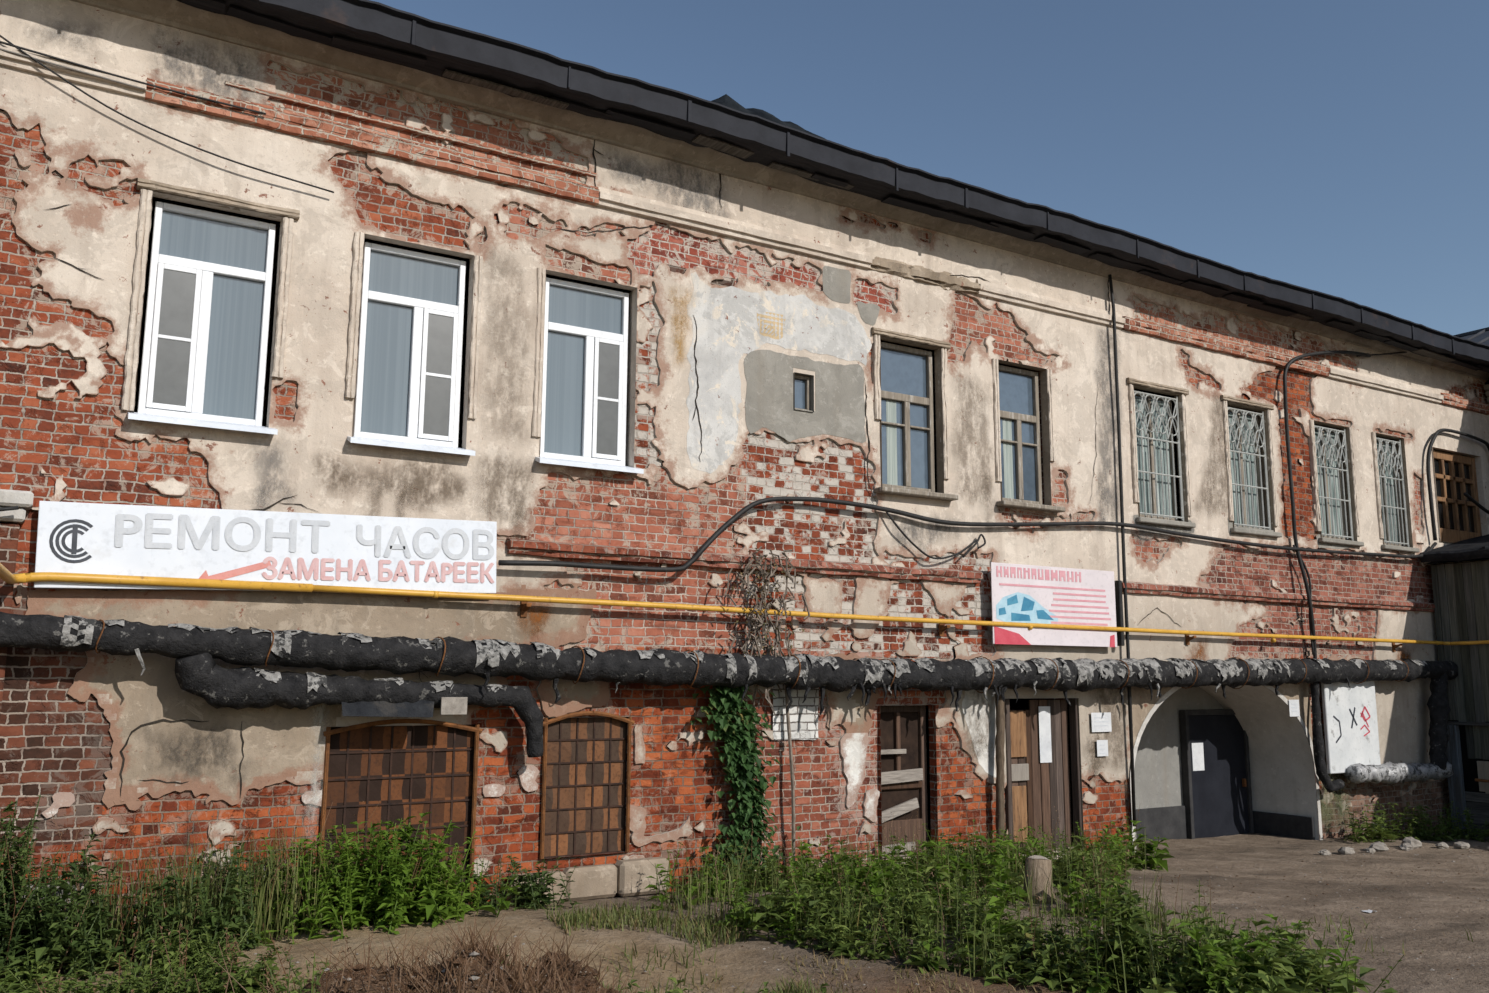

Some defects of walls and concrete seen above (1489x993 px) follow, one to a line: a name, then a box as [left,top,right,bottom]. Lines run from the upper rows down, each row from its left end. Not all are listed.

spalling [0,110,997,662]
crack [692,315,702,462]
spalling [948,292,1060,367]
spalling [1131,295,1439,661]
crack [120,719,244,797]
peeling [0,647,368,939]
spalling [214,659,1006,902]
spalling [1078,687,1132,852]
spalling [1309,682,1451,839]